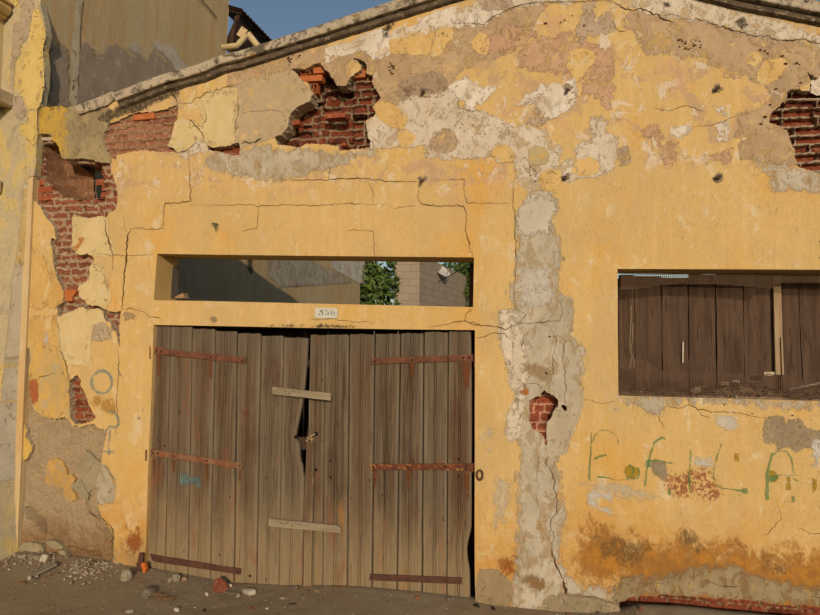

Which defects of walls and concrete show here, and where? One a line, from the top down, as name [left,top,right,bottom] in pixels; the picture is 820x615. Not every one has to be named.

peeling [26,0,820,351]
flaking render [21,377,116,562]
crack [94,86,621,608]
peeling [497,309,567,445]
flaking render [612,562,820,615]